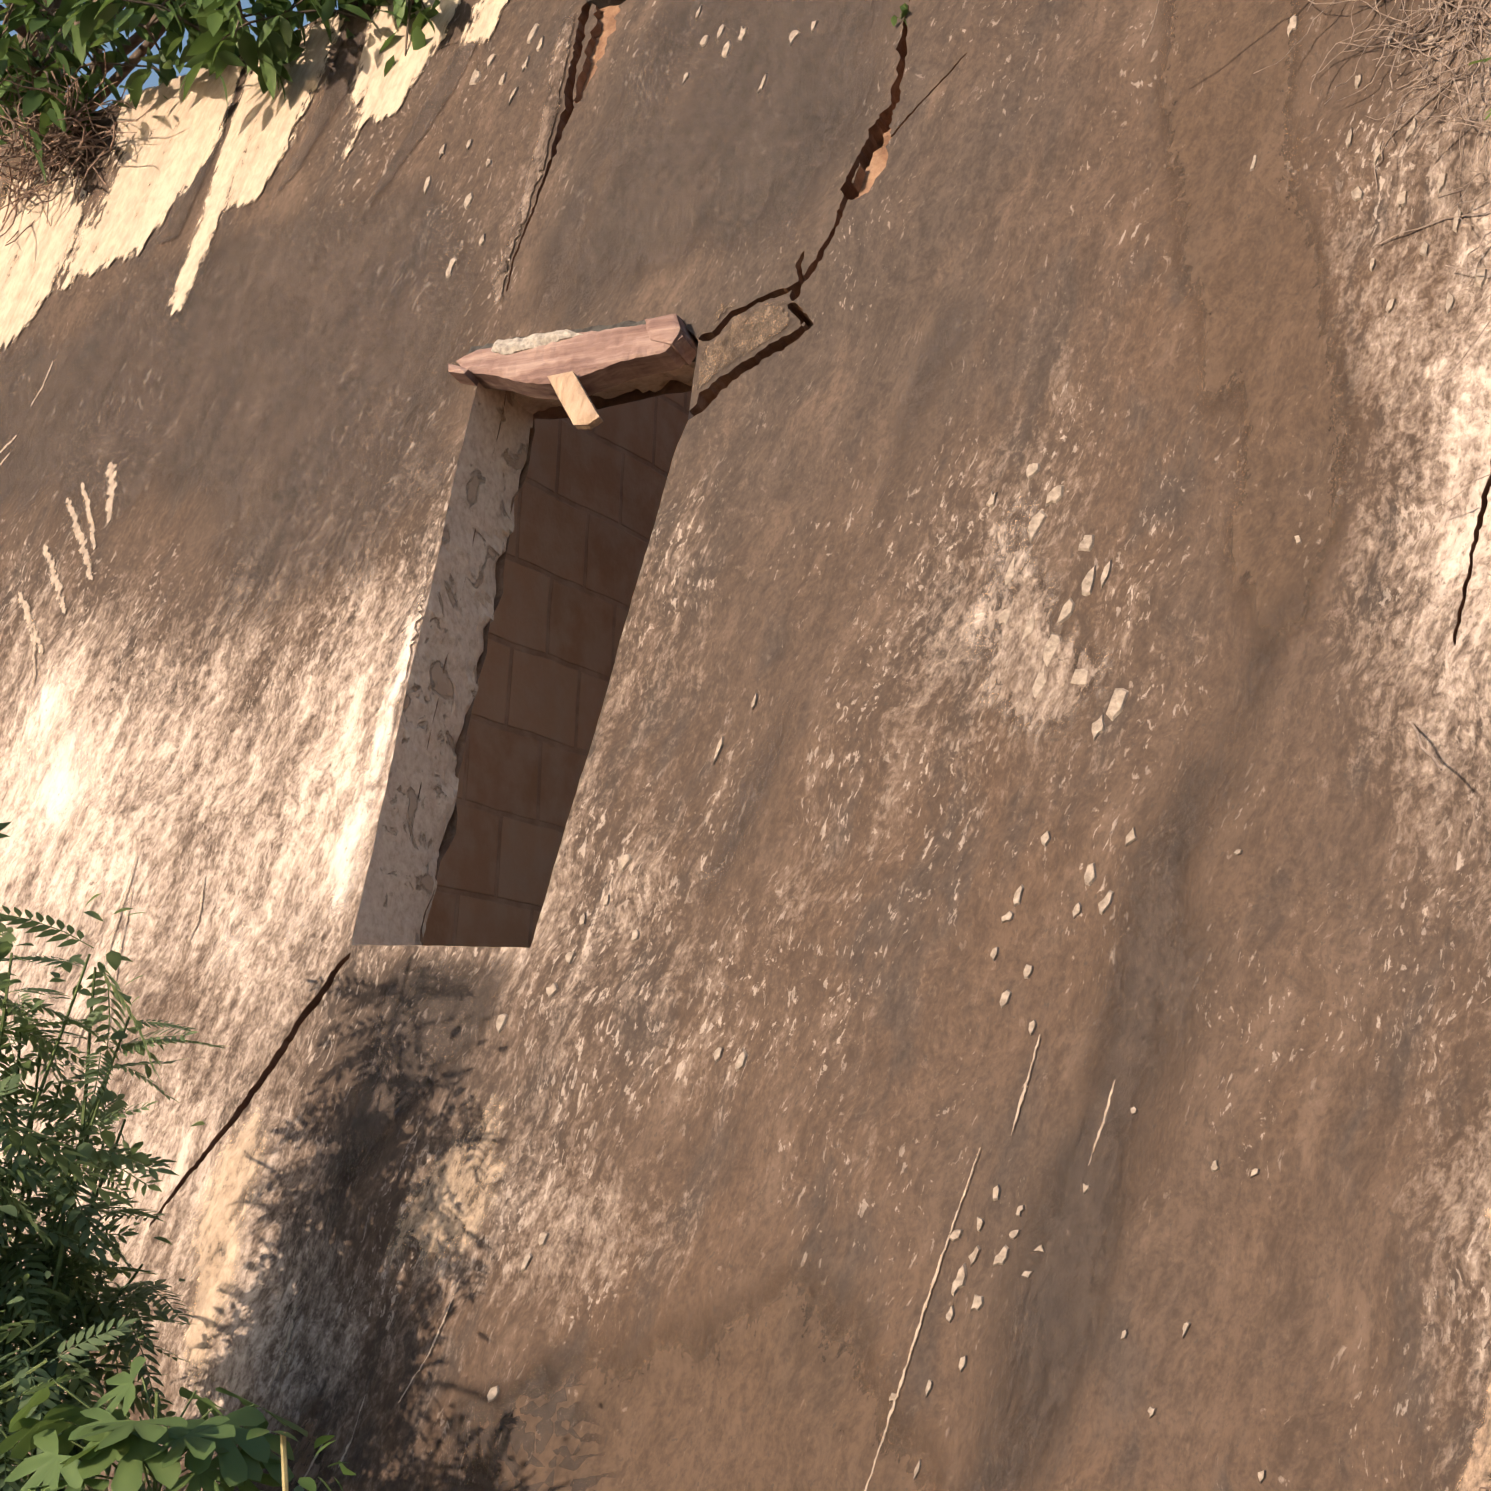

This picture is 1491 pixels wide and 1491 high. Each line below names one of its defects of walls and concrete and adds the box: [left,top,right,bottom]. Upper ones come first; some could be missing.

peeling [0,12,345,348]
peeling [344,0,574,301]
crack [506,2,620,292]
crack [689,0,966,416]
peeling [1287,15,1298,37]
peeling [1373,141,1383,165]
peeling [1406,117,1417,141]
crack [1453,459,1491,646]
peeling [331,594,425,908]
crack [149,953,351,1227]
peeling [487,1385,500,1403]
spalling [1457,1382,1491,1491]